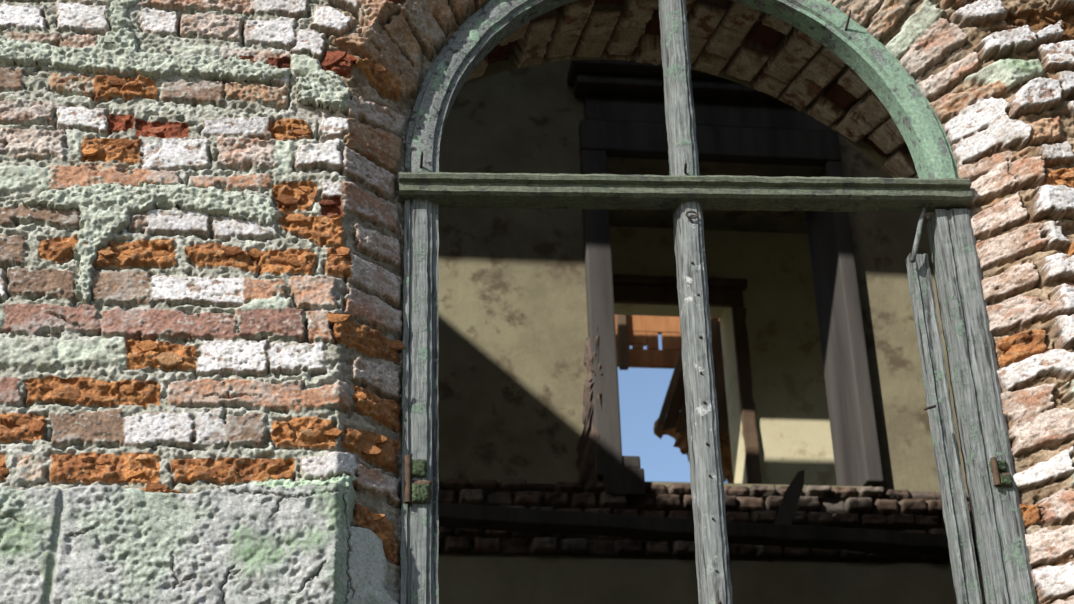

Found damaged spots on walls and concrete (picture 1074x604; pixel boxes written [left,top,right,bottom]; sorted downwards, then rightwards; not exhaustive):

crack [231,490,354,604]